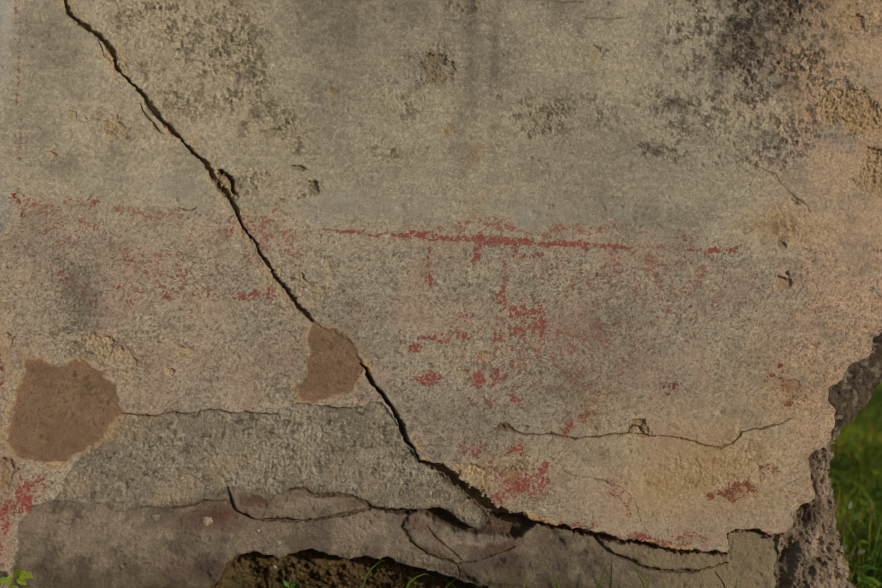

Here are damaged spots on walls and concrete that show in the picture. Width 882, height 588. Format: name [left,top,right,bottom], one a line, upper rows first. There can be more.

leakage [715,0,807,68]
crack [65,0,314,323]
peeling [3,188,104,246]
peeling [324,217,738,435]
flaking render [0,457,46,567]
crack [171,499,208,510]
crack [122,409,283,418]
flaking render [55,402,553,529]
crack [227,363,792,588]
spalling [626,419,653,442]
peeling [706,481,758,503]
spalling [828,332,882,437]